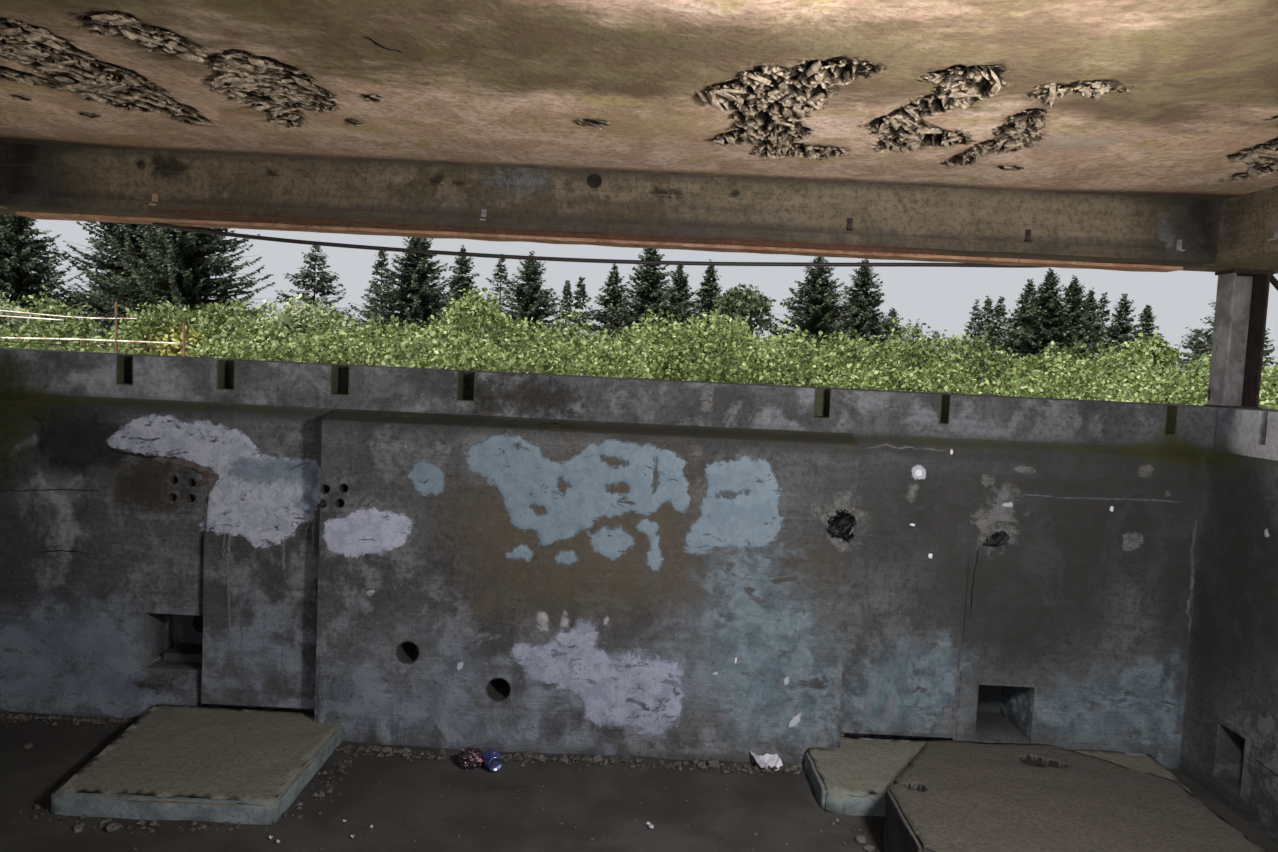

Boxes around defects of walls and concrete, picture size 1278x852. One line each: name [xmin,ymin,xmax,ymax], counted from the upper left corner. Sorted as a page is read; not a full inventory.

spalling [0,10,365,128]
spalling [696,58,888,161]
spalling [859,64,1134,172]
spalling [1218,138,1278,182]
peeling [107,414,413,558]
peeling [466,433,784,572]
peeling [511,610,685,739]